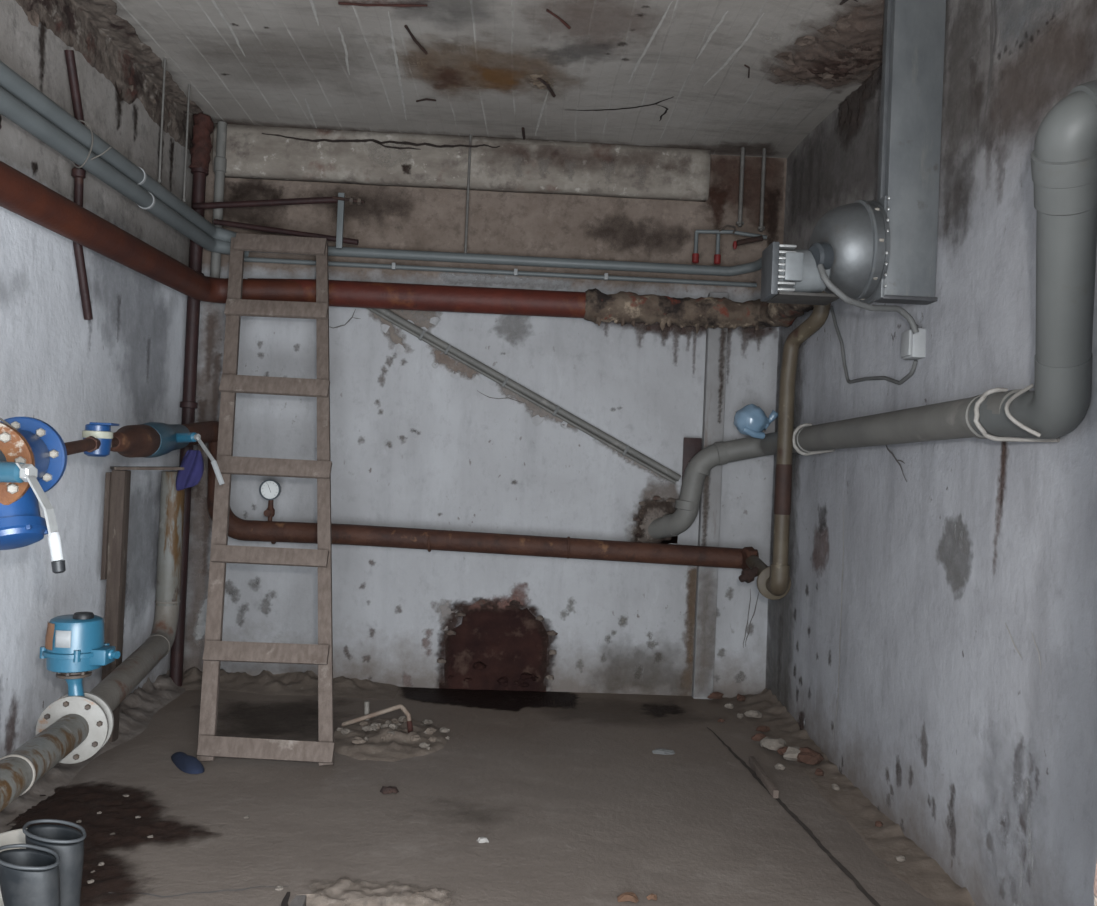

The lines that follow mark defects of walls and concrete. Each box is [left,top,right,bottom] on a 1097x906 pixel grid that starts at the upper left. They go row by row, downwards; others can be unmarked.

spalling [15,0,203,192]
crack [262,133,500,150]
spalling [768,0,885,141]
water stain [944,2,1096,165]
spalling [633,495,676,542]
water stain [939,518,970,590]
spalling [423,583,558,691]
water stain [6,783,212,906]